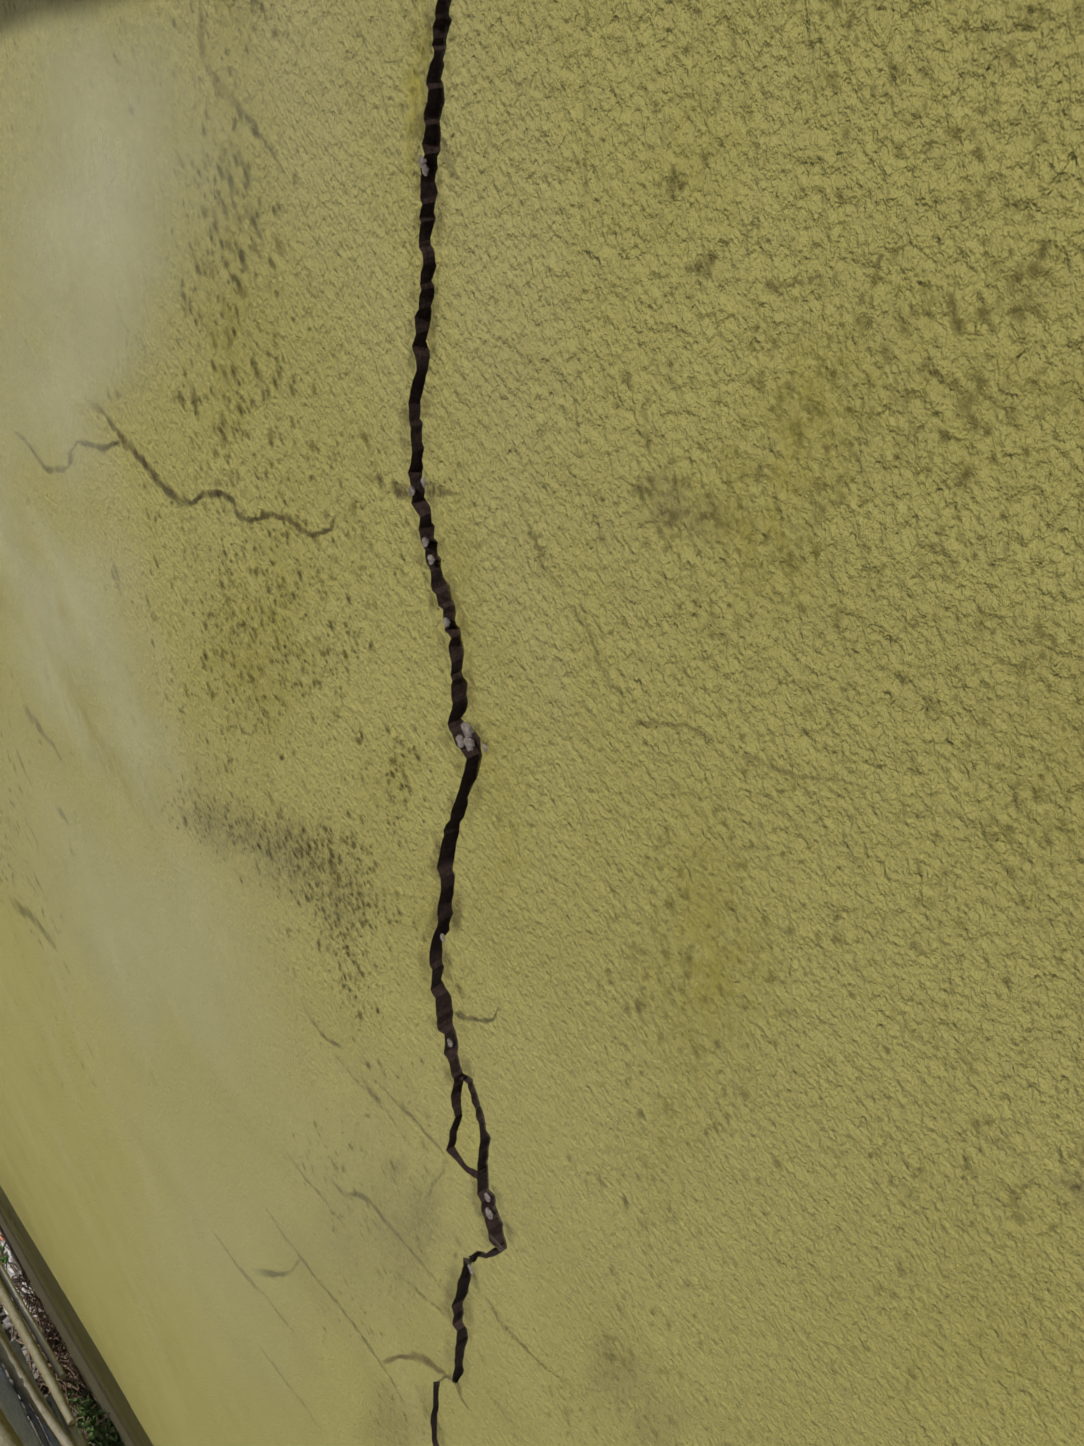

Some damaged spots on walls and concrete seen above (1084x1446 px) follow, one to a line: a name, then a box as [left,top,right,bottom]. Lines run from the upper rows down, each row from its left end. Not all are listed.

crack [31,409,332,537]
crack [377,0,507,1446]